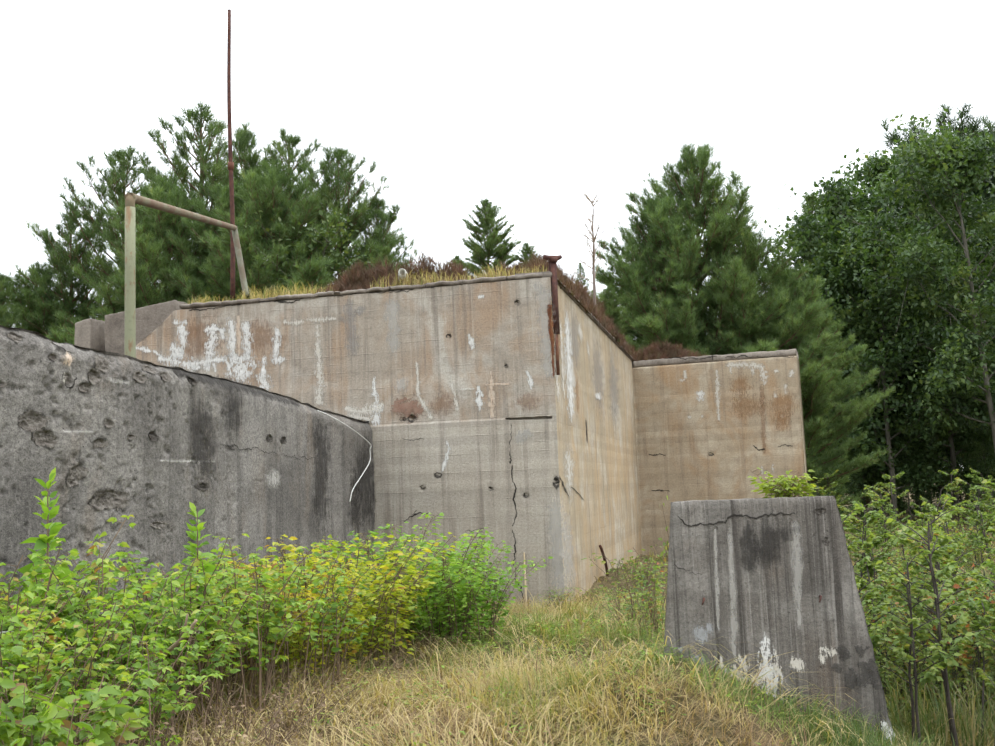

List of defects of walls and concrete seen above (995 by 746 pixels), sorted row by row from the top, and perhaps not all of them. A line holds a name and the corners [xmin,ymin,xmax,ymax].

rust [547,305,556,377]
spalling [49,351,110,393]
water stain [136,315,336,475]
water stain [344,377,384,426]
spalling [17,410,57,449]
spalling [94,419,115,448]
crack [222,444,313,460]
spalling [89,488,130,510]
crack [509,425,524,603]
crack [651,489,795,527]
efflorescence [719,631,806,697]
water stain [818,644,837,664]